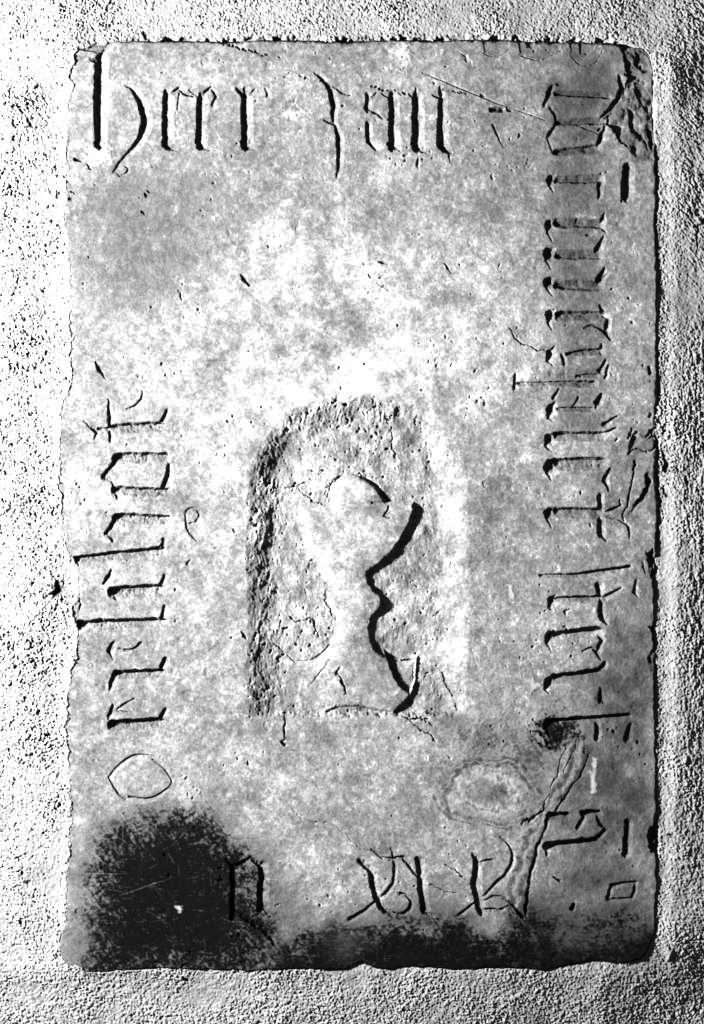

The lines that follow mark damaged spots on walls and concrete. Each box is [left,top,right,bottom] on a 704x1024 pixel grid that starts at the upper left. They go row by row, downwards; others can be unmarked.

crack [383,505,392,520]
water stain [81,808,654,973]
crack [521,741,592,918]